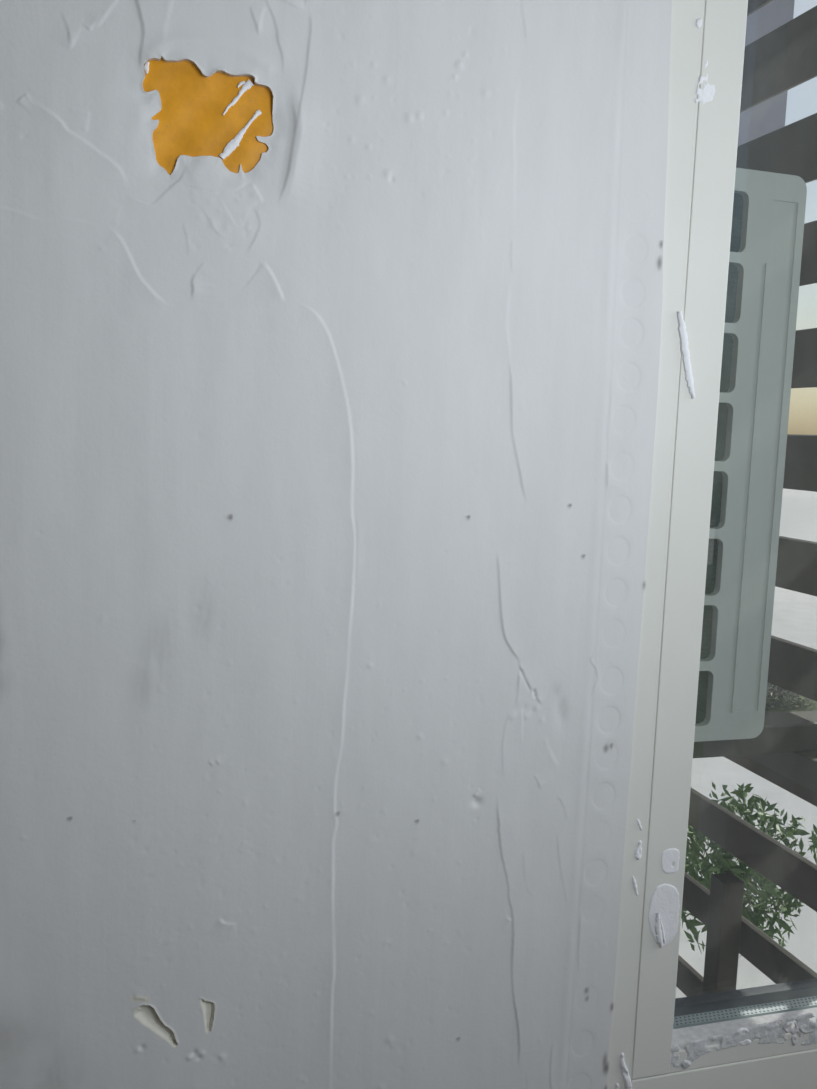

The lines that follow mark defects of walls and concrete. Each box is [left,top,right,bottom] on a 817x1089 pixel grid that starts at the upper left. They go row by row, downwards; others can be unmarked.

crack [56,0,149,76]
flaking render [134,28,306,219]
crack [295,4,315,132]
crack [506,354,532,511]
crack [253,253,361,1089]
crack [494,542,546,1075]
spalling [130,995,178,1048]
spalling [200,997,216,1034]